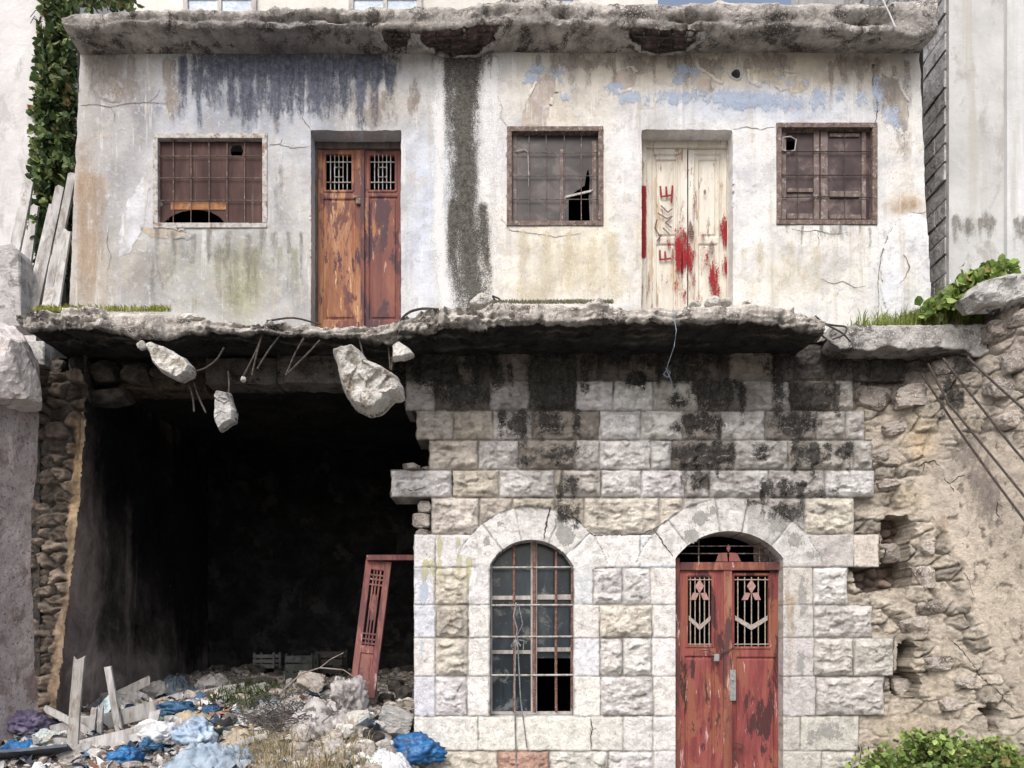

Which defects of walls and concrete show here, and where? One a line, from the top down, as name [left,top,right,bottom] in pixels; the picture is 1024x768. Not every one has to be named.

spalling [379,25,504,58]
crack [81,90,167,120]
leakage [162,53,400,130]
spalling [604,28,910,135]
leakage [408,53,504,311]
spalling [229,317,320,377]
leakage [497,353,747,529]
leakage [744,346,939,522]
crack [917,460,963,491]
spalling [851,519,901,593]
spalling [887,643,912,696]
crack [948,637,1018,712]